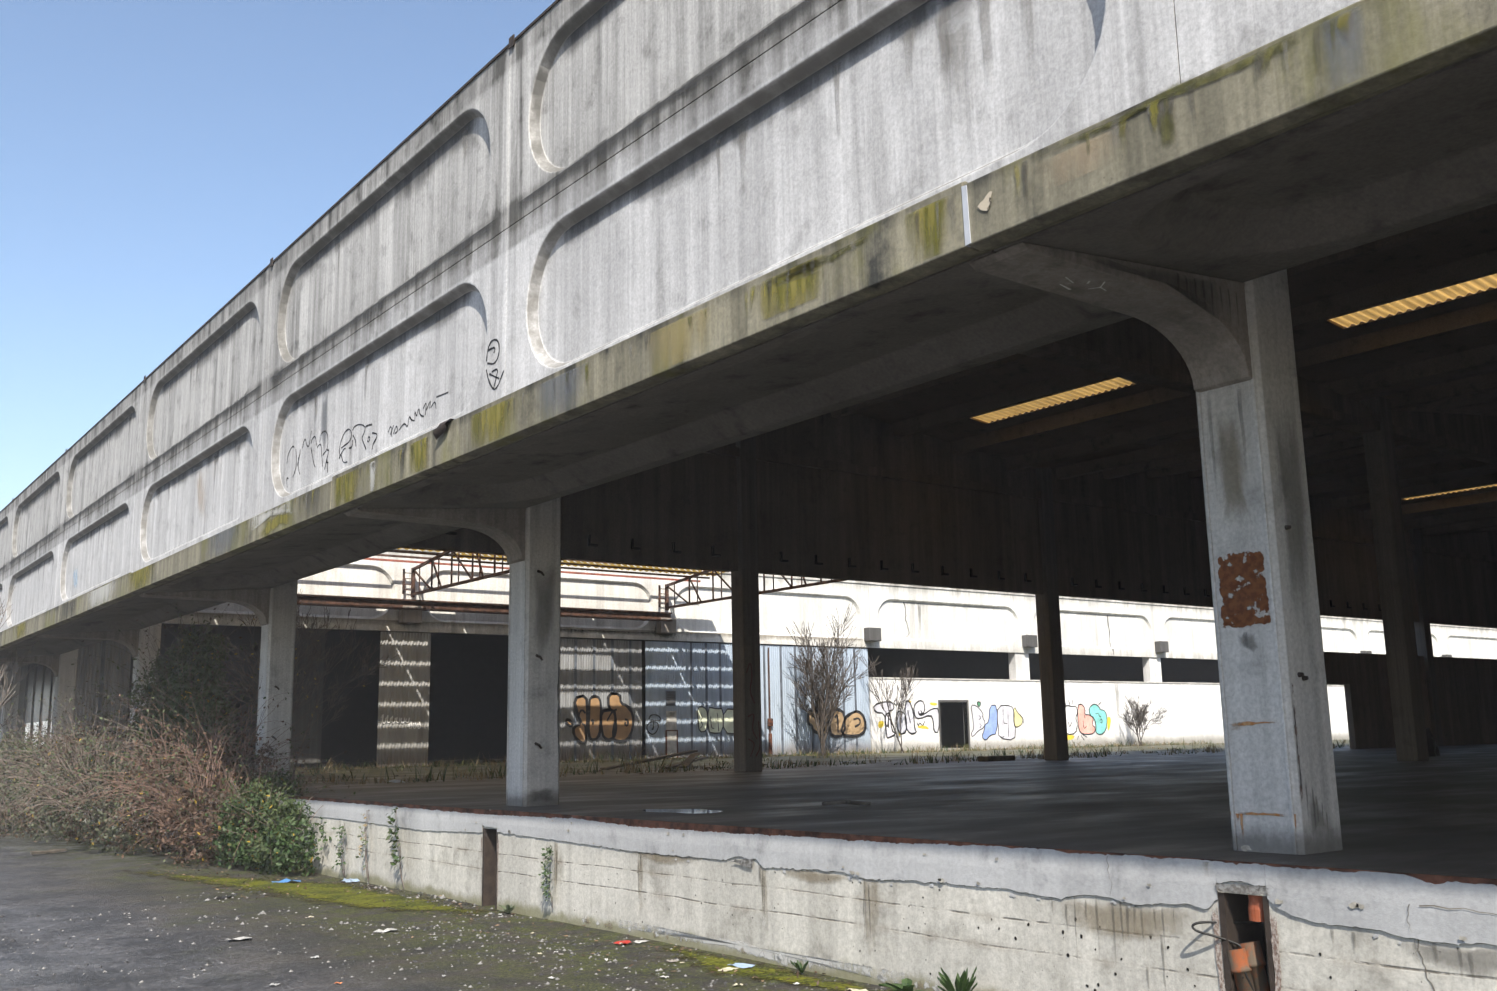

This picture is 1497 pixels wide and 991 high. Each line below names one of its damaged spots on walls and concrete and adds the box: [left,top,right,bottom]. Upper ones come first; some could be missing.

crack [1407,904,1497,991]